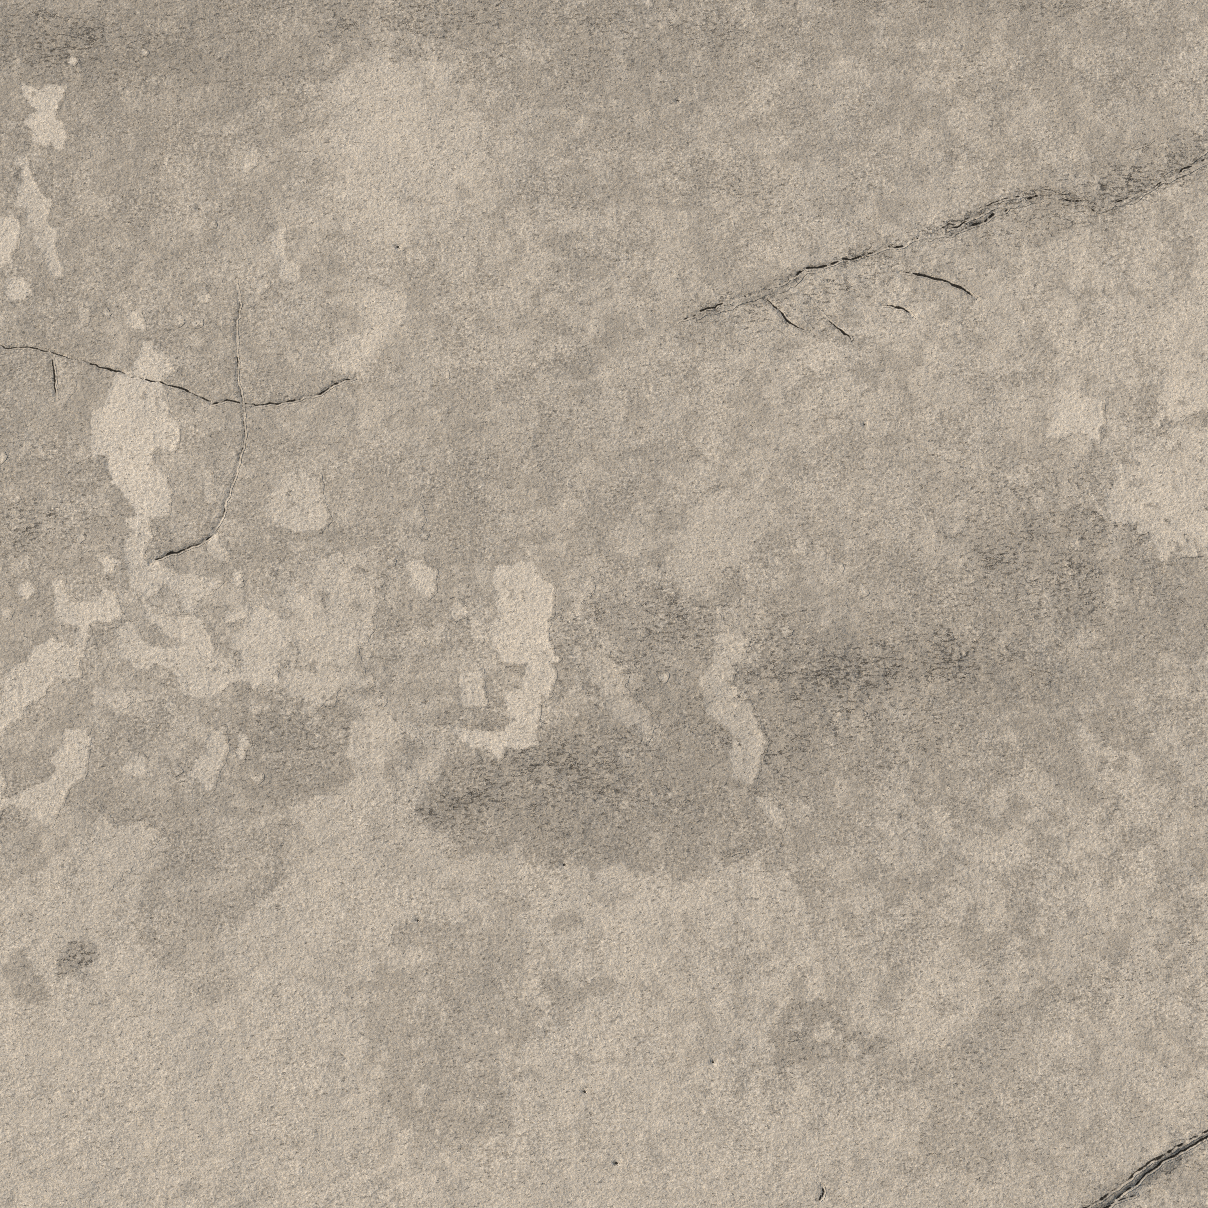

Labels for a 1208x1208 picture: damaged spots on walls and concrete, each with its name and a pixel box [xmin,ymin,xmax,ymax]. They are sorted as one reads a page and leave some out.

crack [675,146,1208,342]
crack [0,283,356,565]
crack [817,1185,826,1202]
crack [1080,1128,1208,1208]